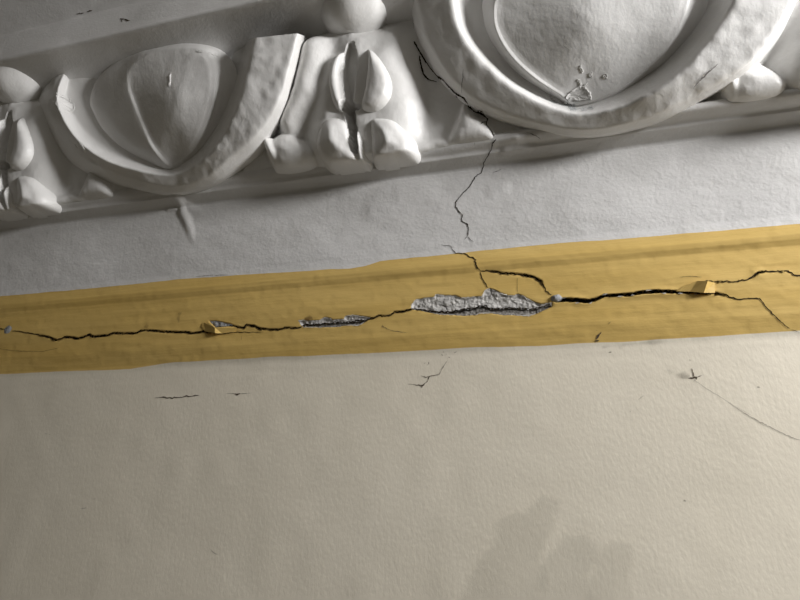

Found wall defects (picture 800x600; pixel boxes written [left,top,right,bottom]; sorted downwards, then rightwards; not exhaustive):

peeling [563,65,592,110]
crack [413,23,800,331]
flaking render [411,288,552,316]
flaking render [299,314,370,328]
crack [370,308,413,333]
crack [1,324,301,352]